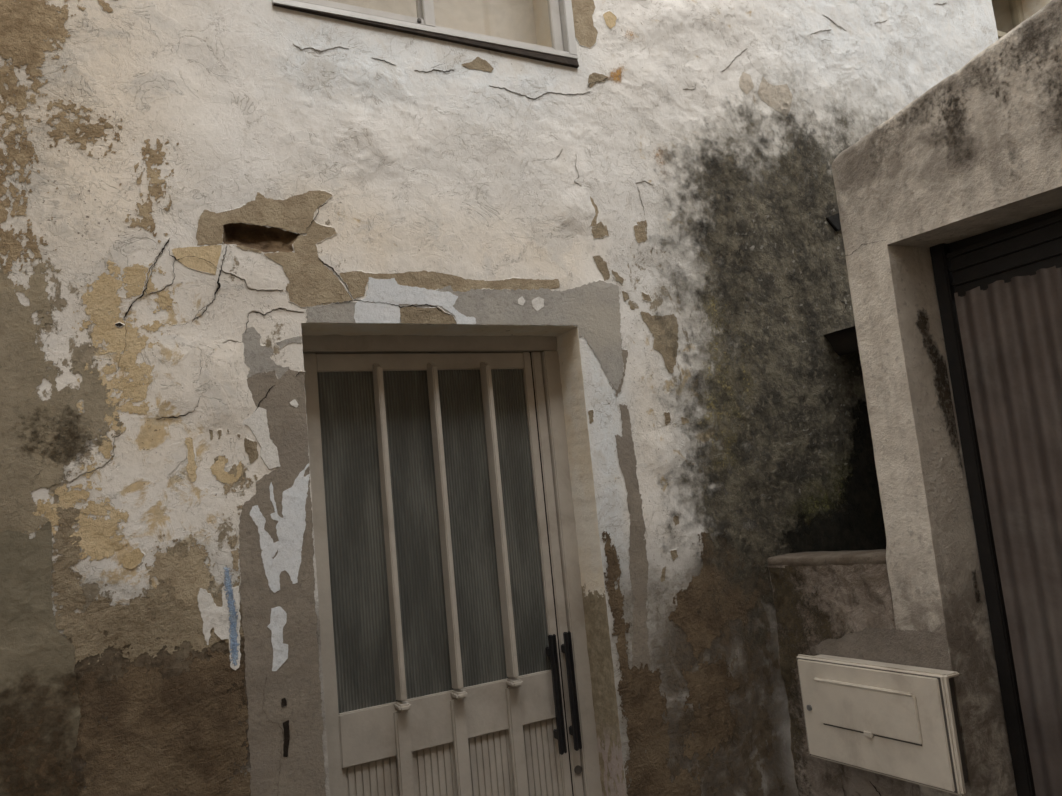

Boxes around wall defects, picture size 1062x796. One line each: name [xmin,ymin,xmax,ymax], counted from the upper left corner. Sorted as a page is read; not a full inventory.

crack [293,43,349,52]
crack [372,57,454,73]
crack [489,78,607,100]
peeling [571,0,617,49]
water stain [935,97,970,158]
water stain [1047,74,1062,130]
peeling [0,0,244,670]
crack [114,238,453,379]
flaking render [172,190,560,324]
water stain [661,110,886,796]
peeling [222,463,310,593]
water stain [0,643,251,796]